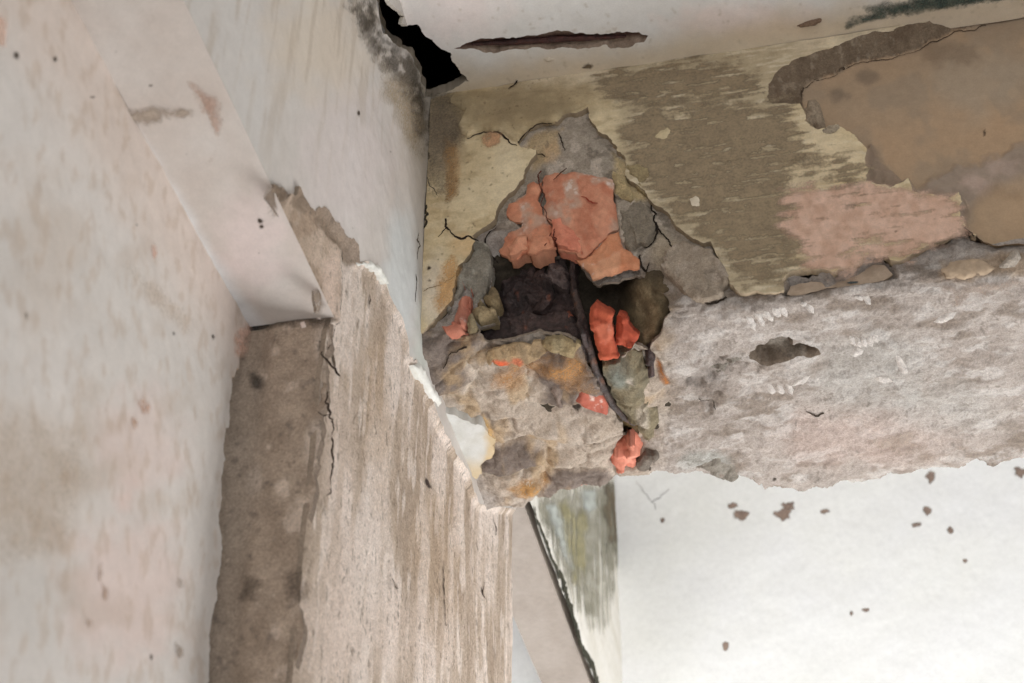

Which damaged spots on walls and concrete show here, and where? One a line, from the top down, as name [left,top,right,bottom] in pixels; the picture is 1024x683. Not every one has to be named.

water stain [352,2,460,200]
crack [415,144,498,302]
crack [467,123,567,246]
crack [638,205,672,272]
water stain [593,55,871,289]
crack [317,257,343,495]
spalling [208,17,1024,683]